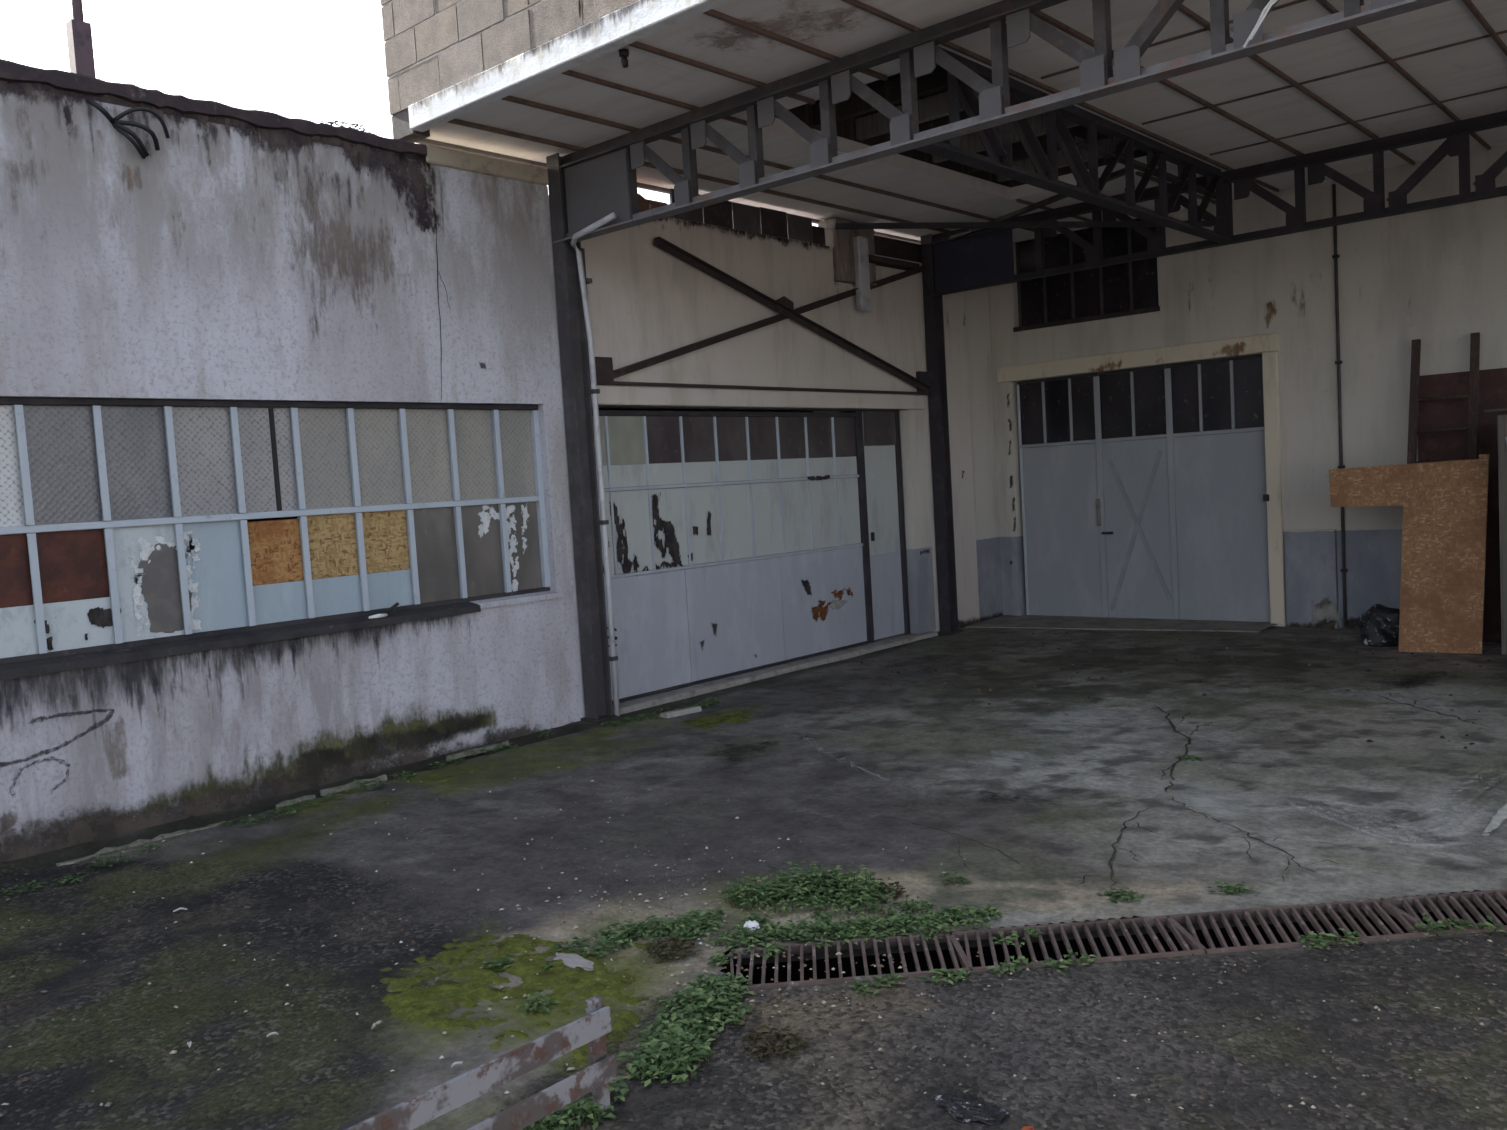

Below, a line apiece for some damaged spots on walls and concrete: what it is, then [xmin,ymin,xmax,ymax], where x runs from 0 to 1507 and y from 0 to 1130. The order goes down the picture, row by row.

damp [524,0,644,54]
damp [0,80,442,301]
peeling [85,530,202,640]
peeling [478,504,530,592]
peeling [603,492,711,576]
rust [801,579,853,622]
damp [0,616,452,722]
damp [0,710,540,864]
crack [1081,705,1364,889]